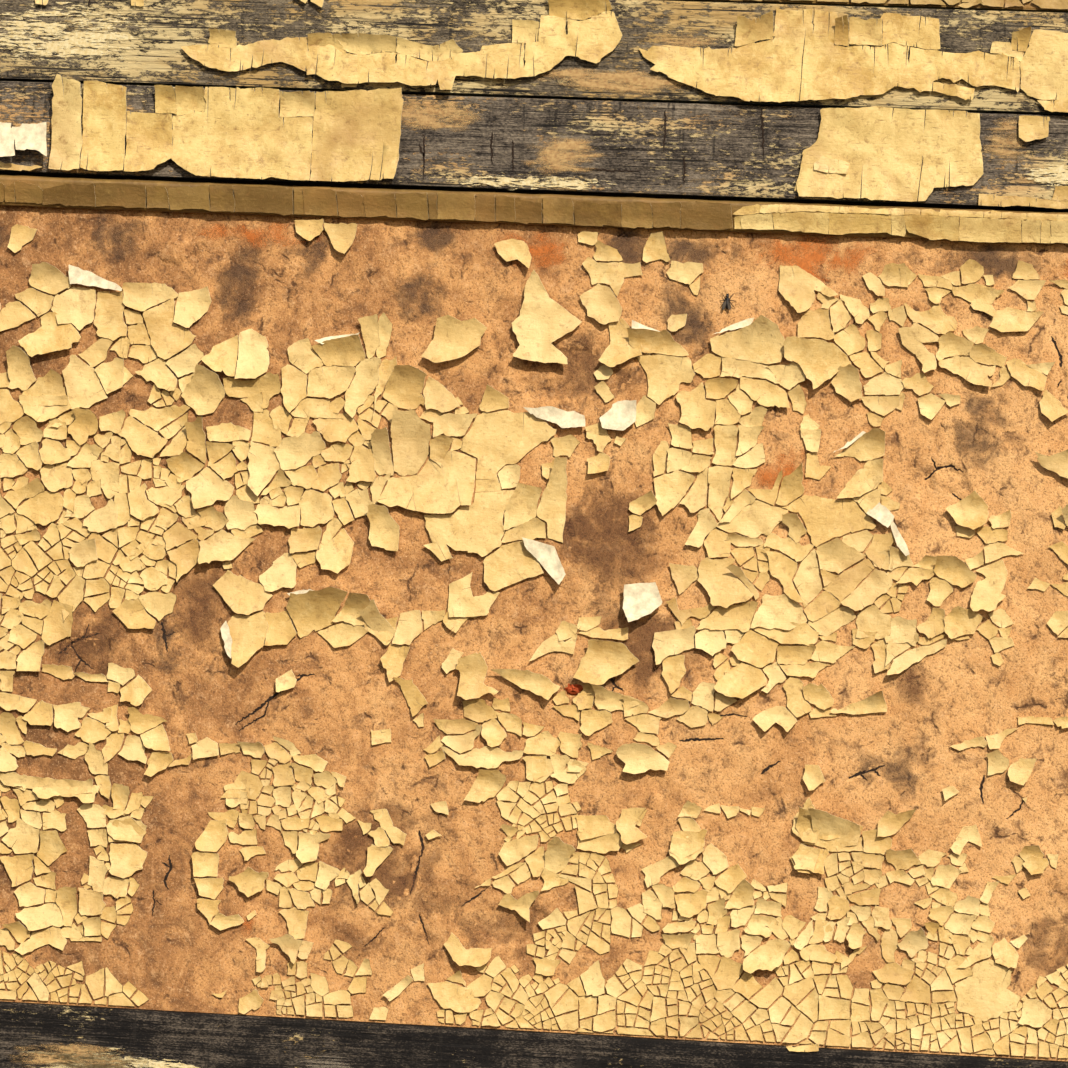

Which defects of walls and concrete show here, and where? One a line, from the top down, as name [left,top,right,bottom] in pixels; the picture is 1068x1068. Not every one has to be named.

peeling [811,0,1068,9]
peeling [0,0,622,182]
peeling [639,8,1068,142]
peeling [794,106,984,202]
peeling [0,181,1068,254]
peeling [0,231,1068,1058]
crack [761,761,781,774]
crack [848,765,885,780]
crack [978,775,986,804]
crack [152,855,172,916]
crack [410,830,429,944]